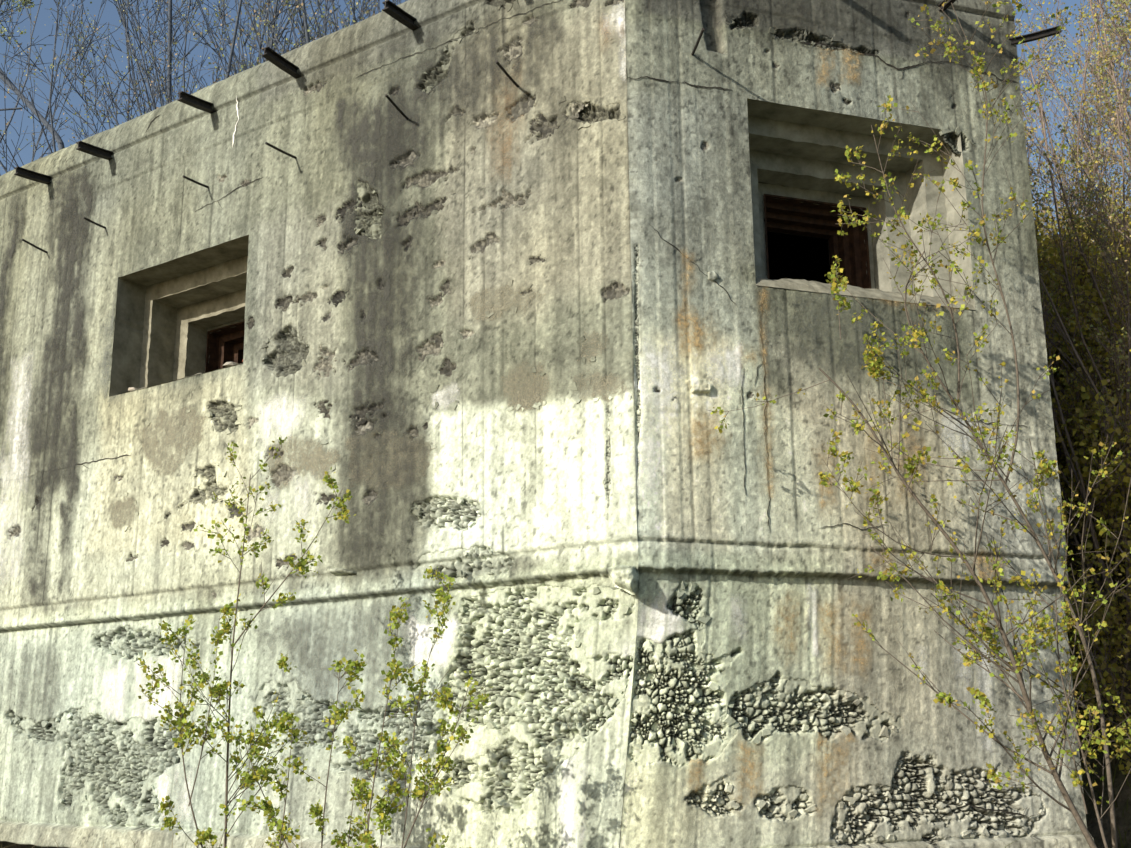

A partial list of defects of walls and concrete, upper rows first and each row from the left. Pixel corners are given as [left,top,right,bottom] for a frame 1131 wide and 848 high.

spalling [445,92,626,144]
crack [629,76,730,90]
damp [336,17,560,568]
crack [654,229,733,302]
damp [0,169,95,598]
spalling [571,245,676,520]
crack [741,293,771,526]
spalling [410,495,481,532]
spalling [90,626,202,662]
spalling [256,544,903,823]
spalling [5,706,192,834]
spalling [830,751,1046,848]